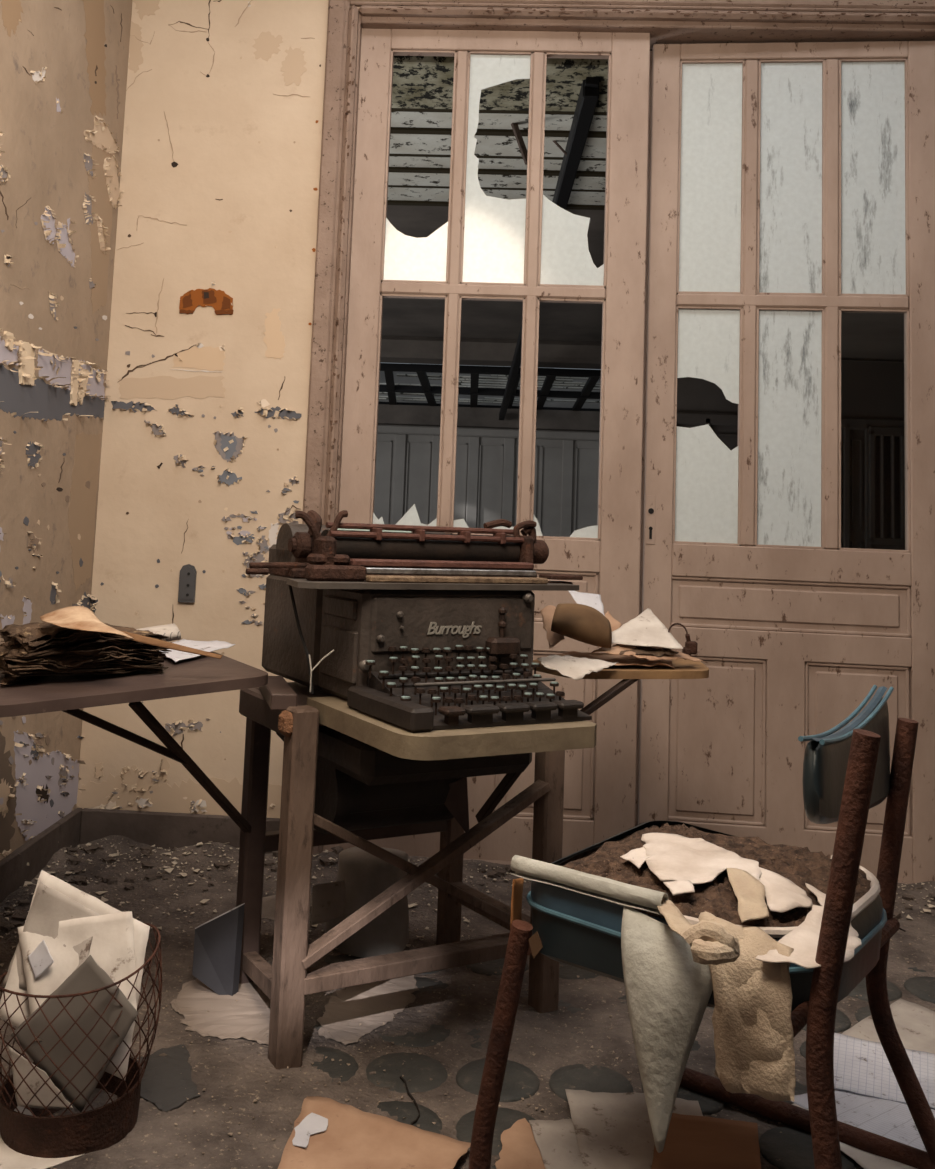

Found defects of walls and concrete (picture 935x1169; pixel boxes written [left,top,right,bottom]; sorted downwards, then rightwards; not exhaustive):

crack [111,0,252,91]
peeling [41,116,124,268]
crack [118,279,197,382]
rust [179,288,234,315]
peeling [25,441,70,502]
peeling [144,419,167,437]
peeling [157,414,248,486]
peeling [0,567,32,629]
peeling [50,571,116,614]
peeling [221,475,299,627]
peeling [0,716,85,841]
peeling [23,839,239,933]